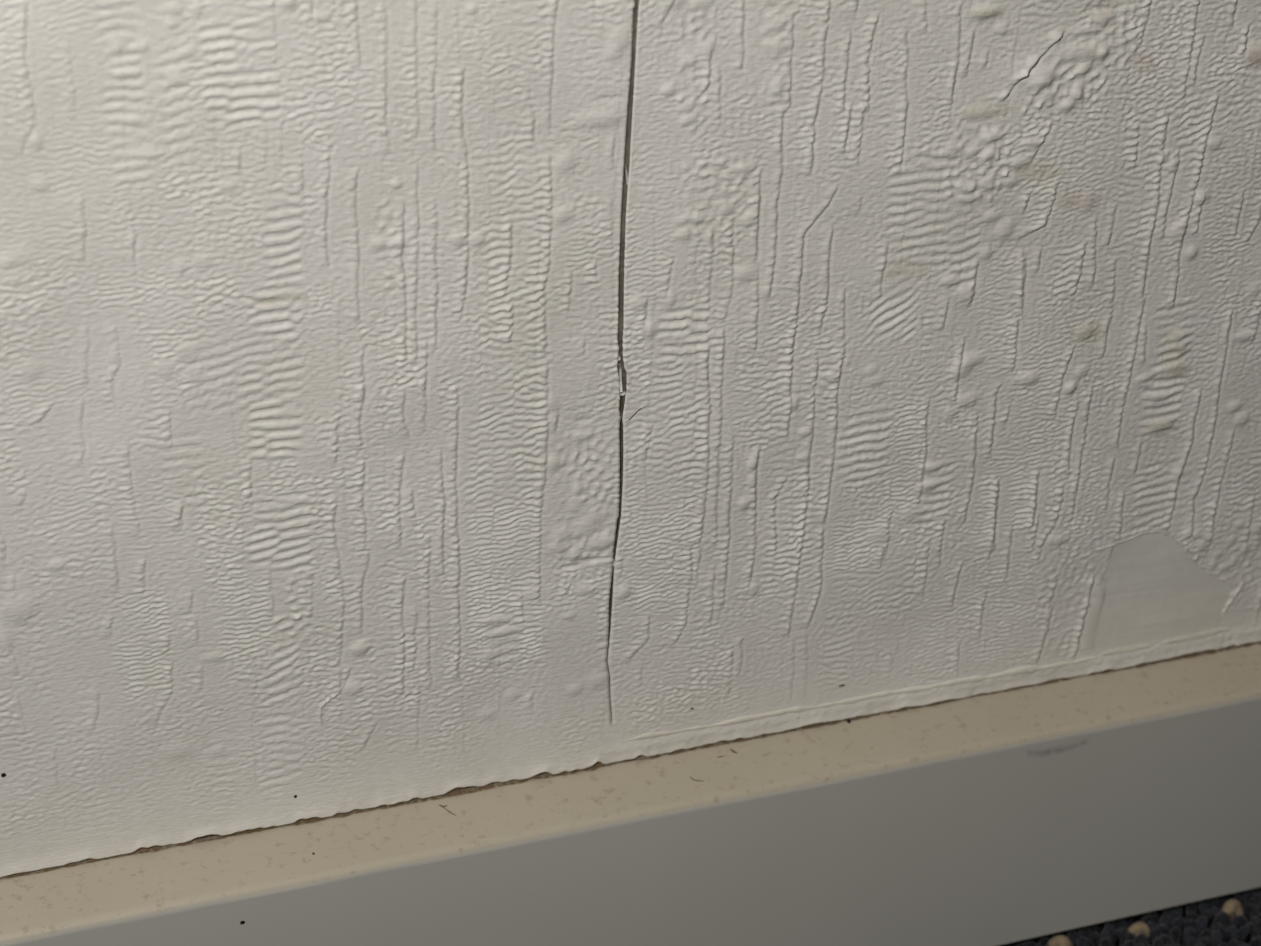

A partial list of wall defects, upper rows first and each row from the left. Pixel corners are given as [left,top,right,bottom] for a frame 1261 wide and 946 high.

crack [607,0,646,720]